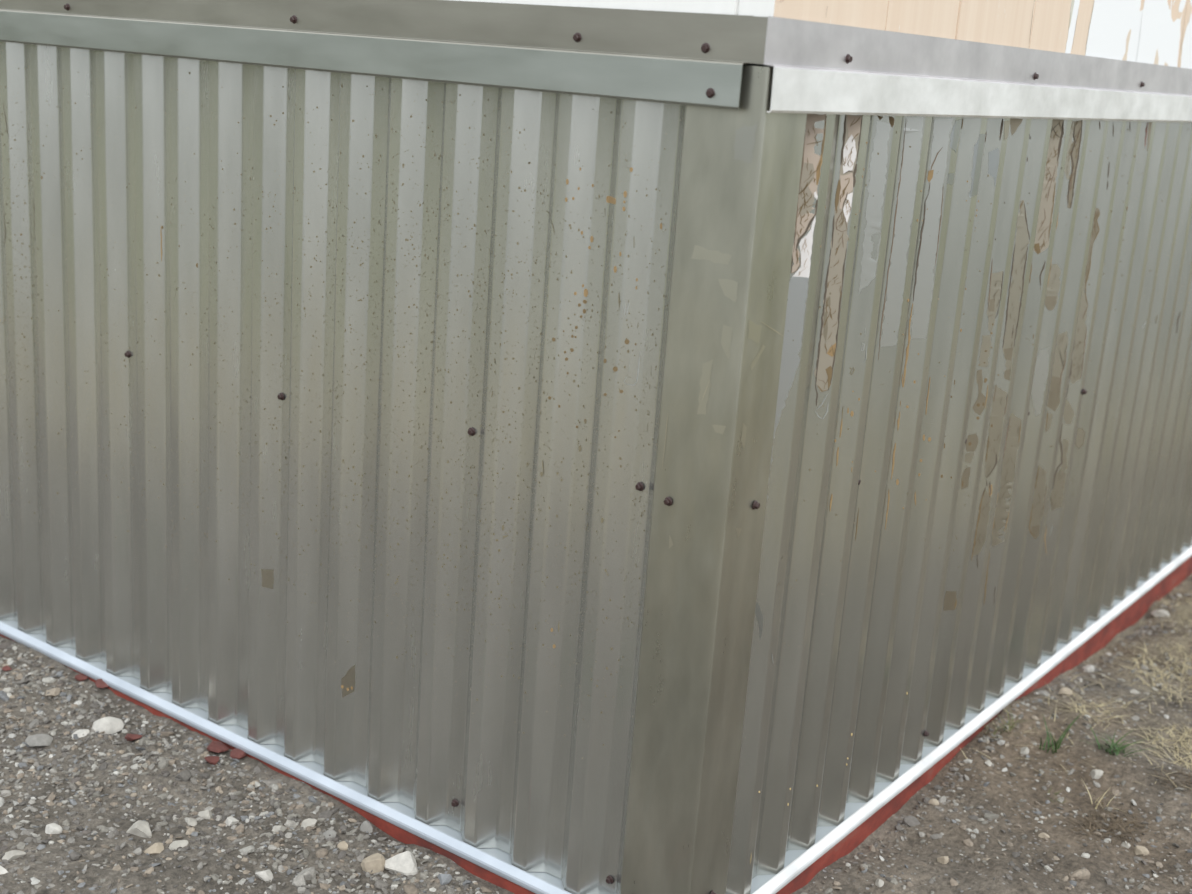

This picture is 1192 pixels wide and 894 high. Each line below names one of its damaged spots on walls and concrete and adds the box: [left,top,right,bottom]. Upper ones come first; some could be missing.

peeling [1065,0,1192,69]
peeling [791,114,826,278]
peeling [814,115,862,392]
peeling [1034,119,1083,252]
peeling [1085,208,1100,283]